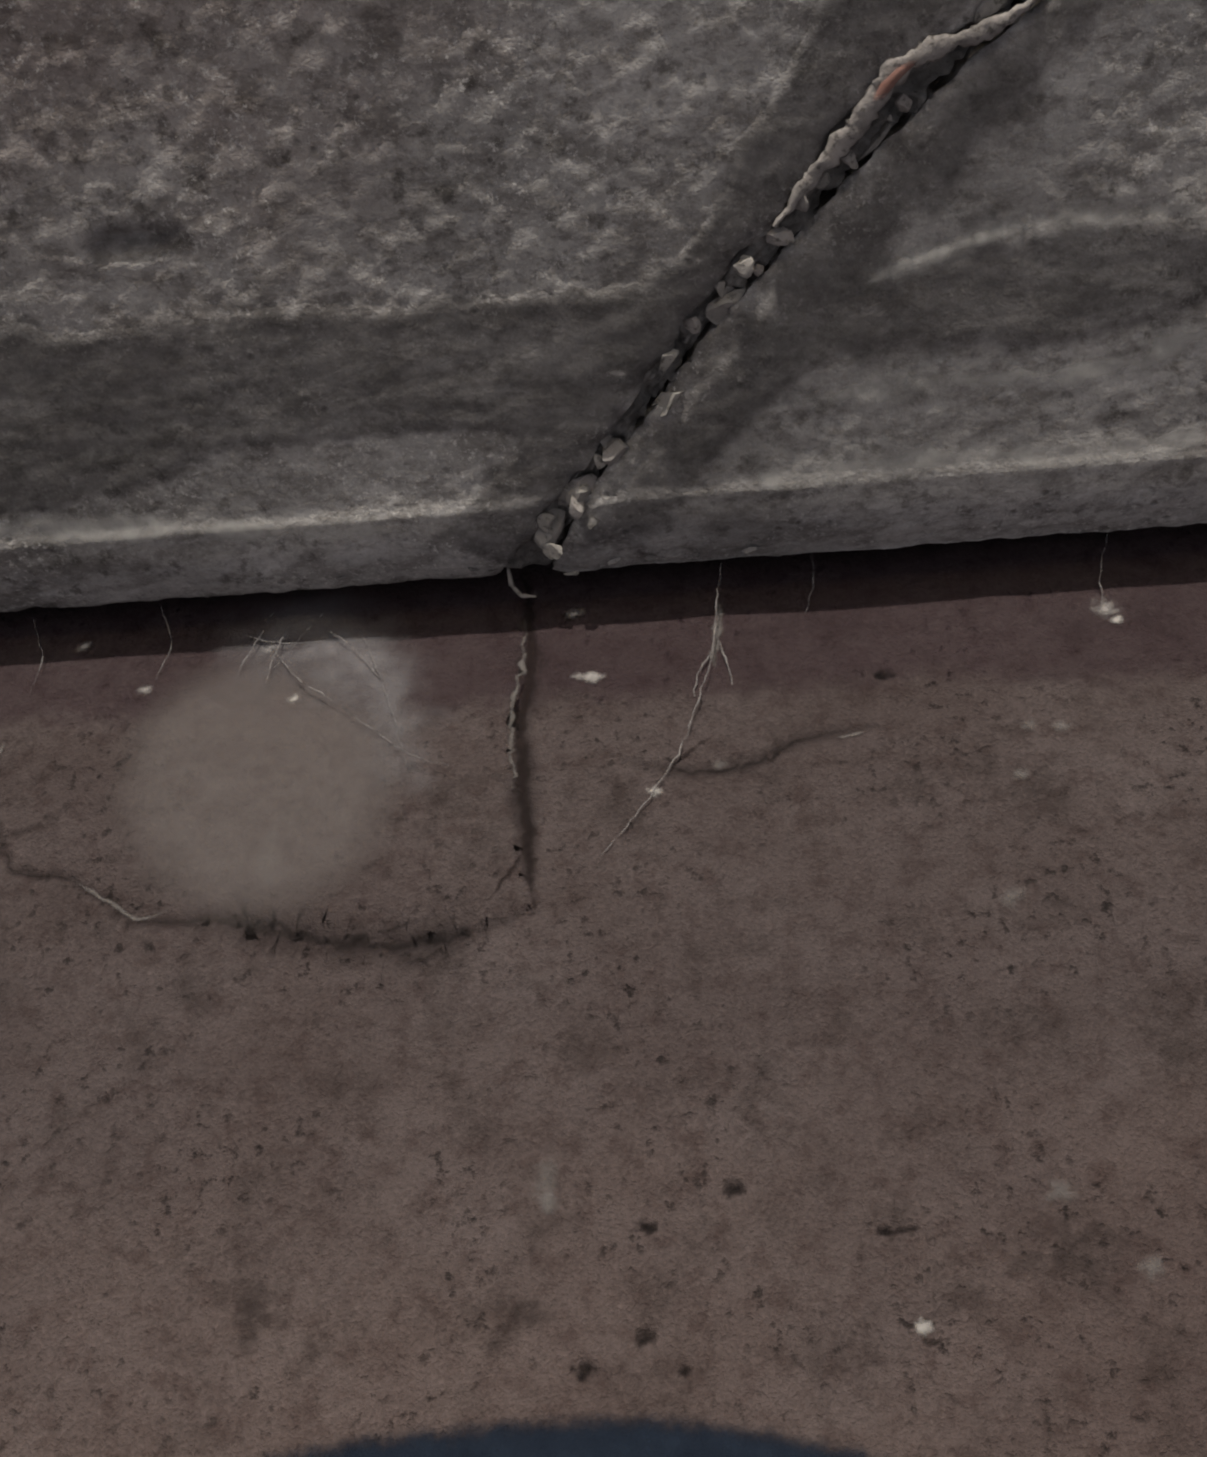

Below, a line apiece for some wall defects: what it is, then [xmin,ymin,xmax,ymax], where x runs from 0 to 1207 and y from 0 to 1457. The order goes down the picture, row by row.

crack [497,598,536,889]